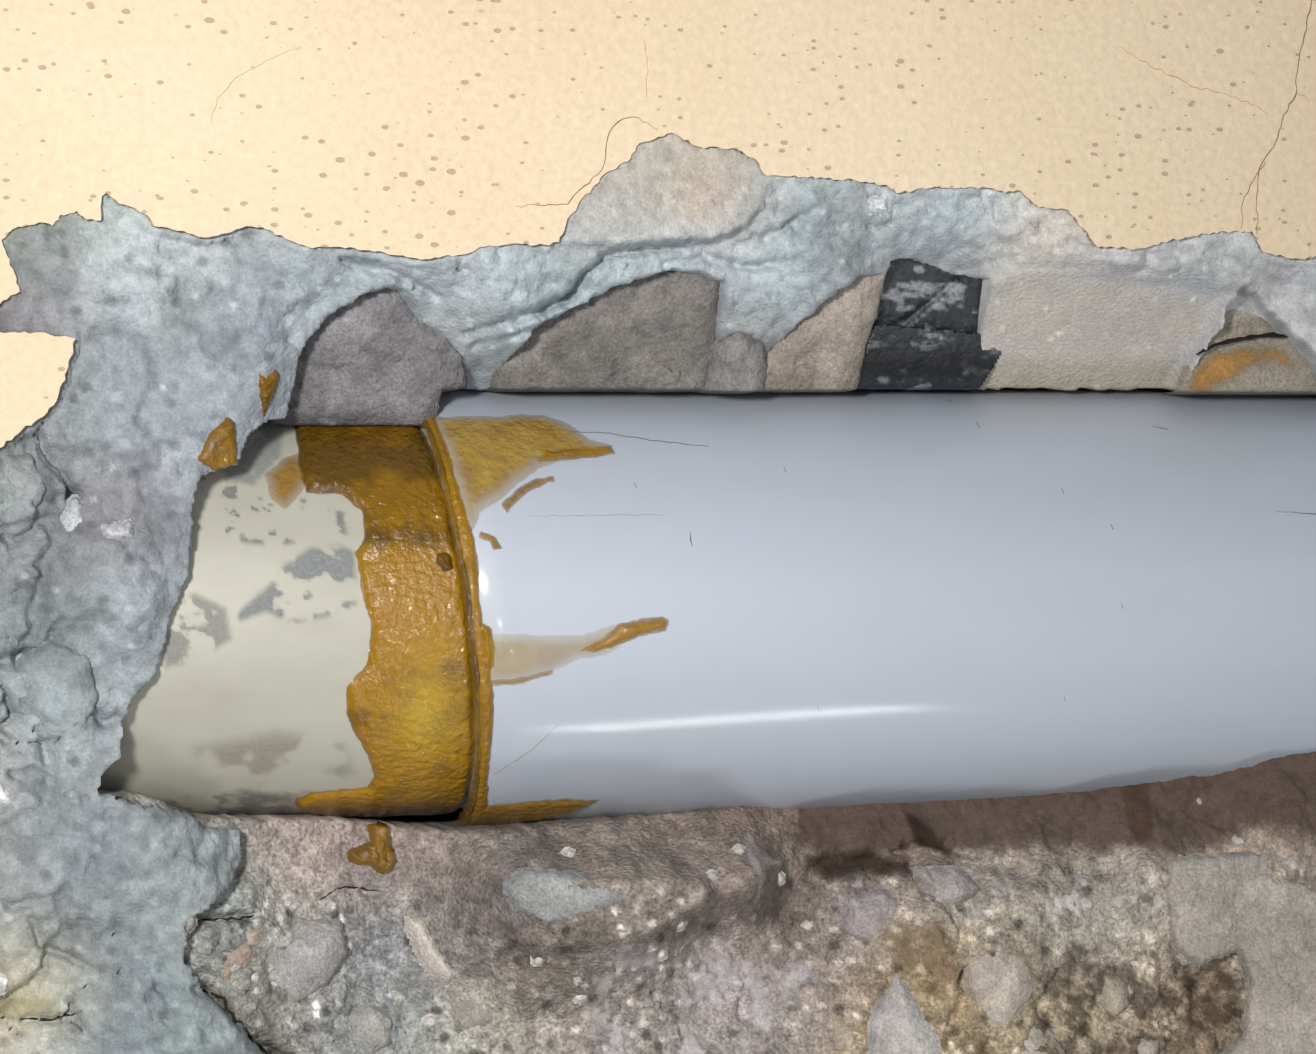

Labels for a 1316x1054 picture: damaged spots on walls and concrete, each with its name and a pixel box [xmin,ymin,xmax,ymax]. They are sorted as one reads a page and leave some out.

crack [1121,0,1316,231]
spalling [267,133,1316,426]
corrosion [1193,350,1287,391]
spalling [0,194,295,1054]
spalling [106,789,1316,1054]